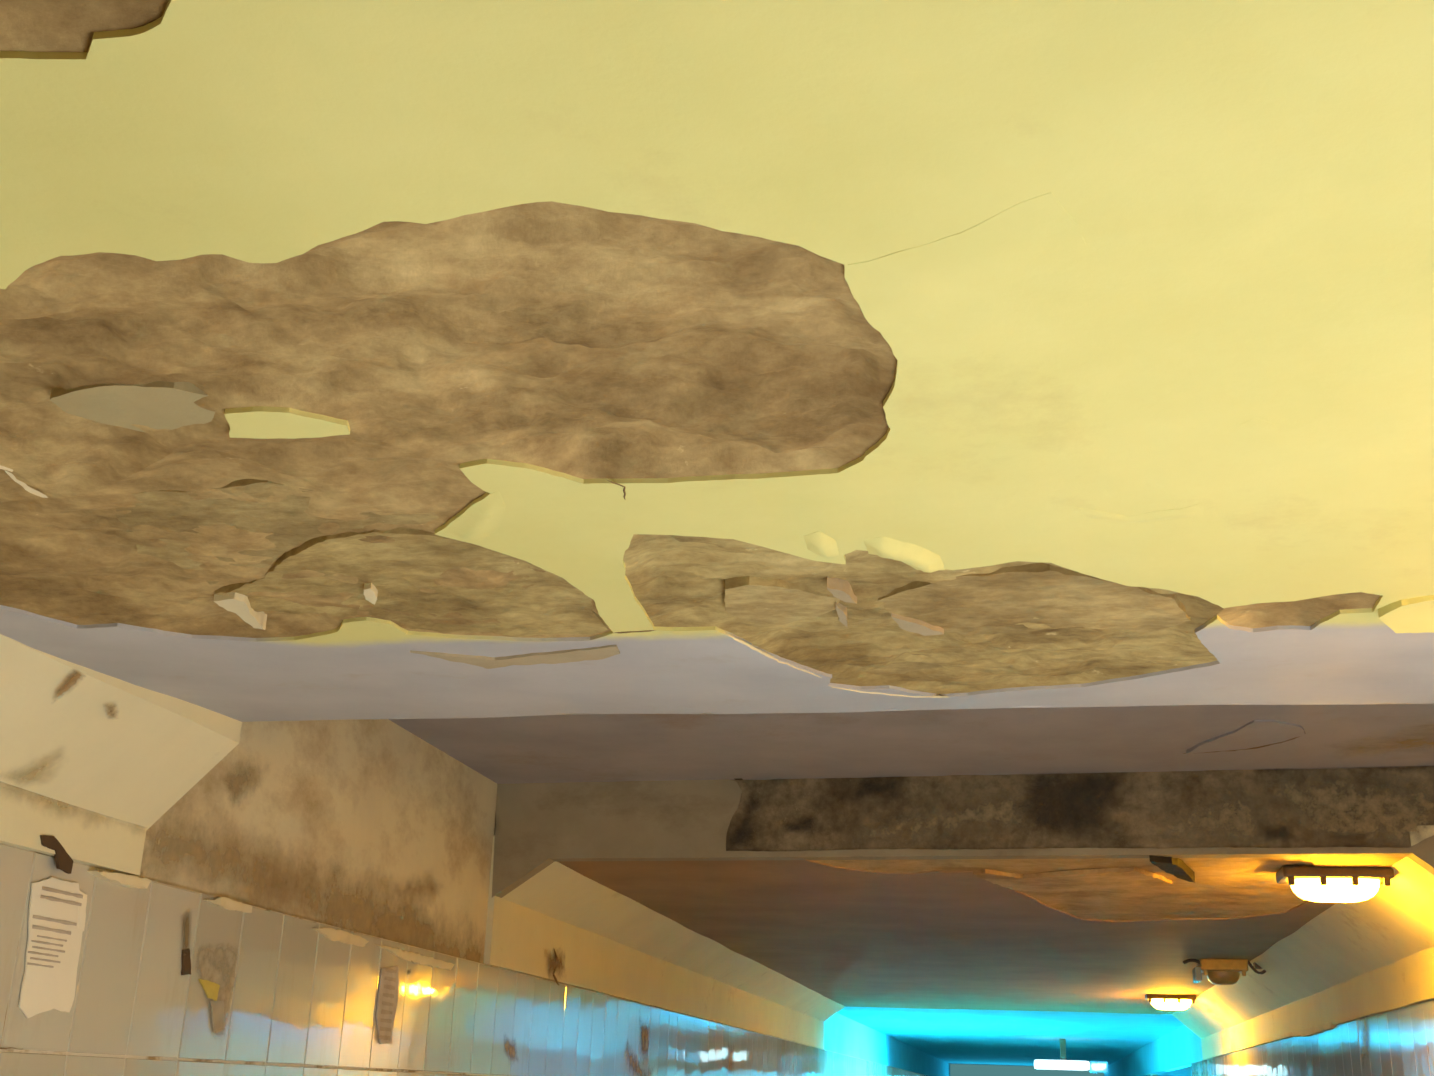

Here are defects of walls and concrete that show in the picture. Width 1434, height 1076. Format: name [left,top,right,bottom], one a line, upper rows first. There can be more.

spalling [0,0,169,52]
spalling [0,201,897,669]
spalling [623,534,1434,698]
spalling [726,766,1434,921]